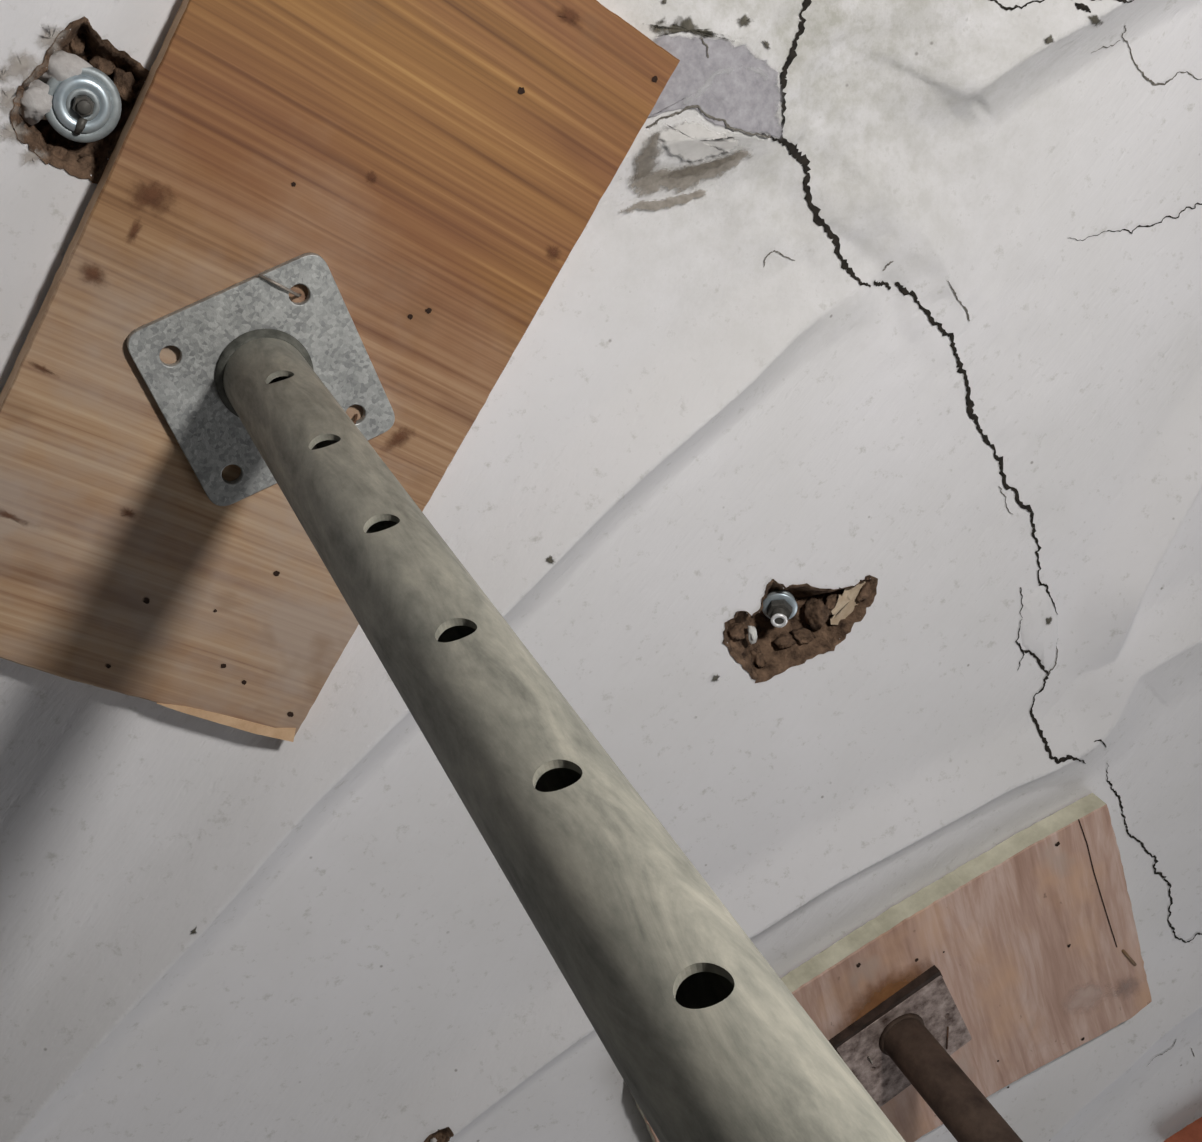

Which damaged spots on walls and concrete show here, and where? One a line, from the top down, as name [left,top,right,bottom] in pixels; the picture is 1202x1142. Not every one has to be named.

flaking render [0,17,149,184]
peeling [647,35,782,162]
crack [762,0,1202,947]
flaking render [722,575,878,683]